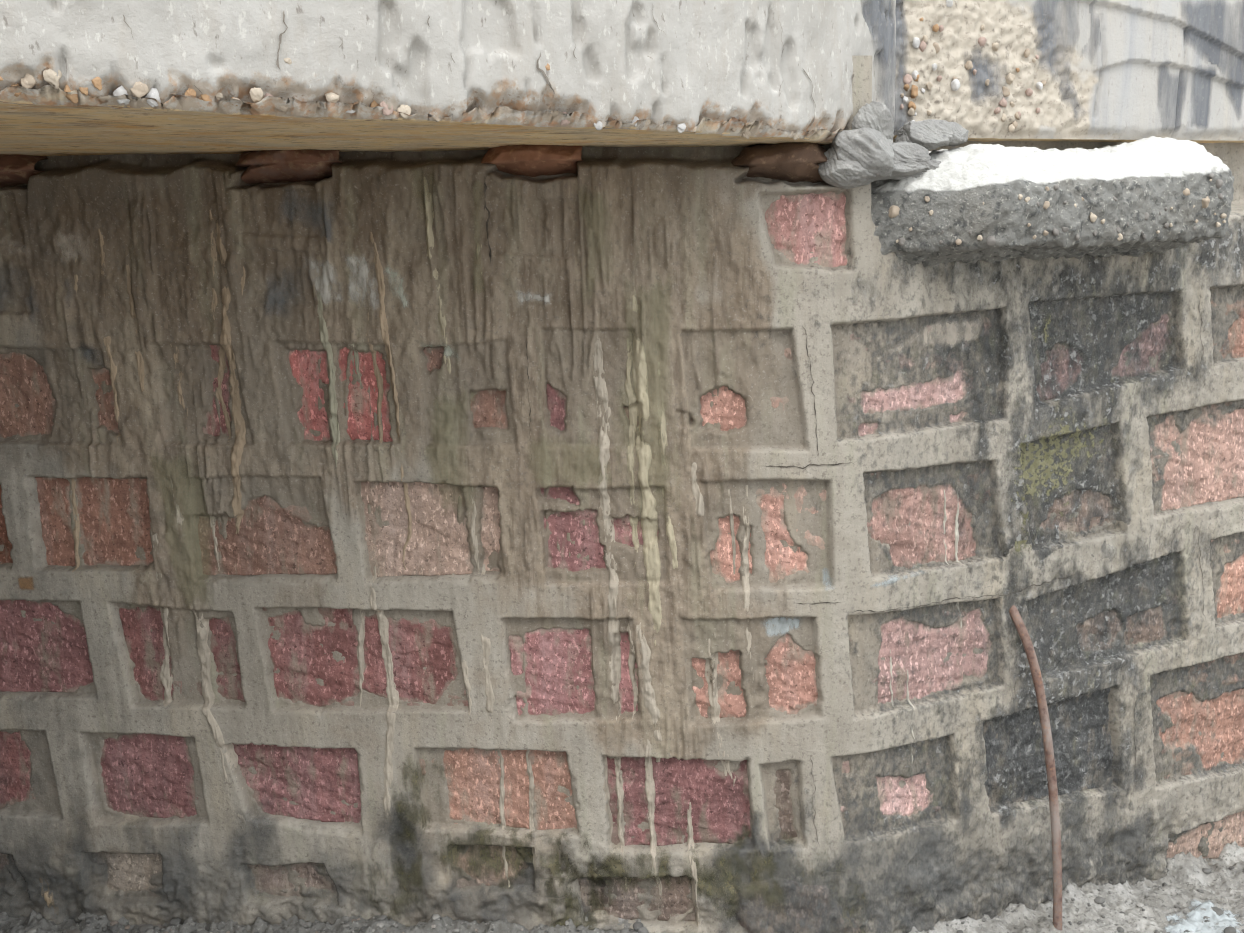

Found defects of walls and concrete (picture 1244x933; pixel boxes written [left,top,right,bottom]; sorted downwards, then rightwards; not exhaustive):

damp [424,162,452,374]
damp [209,210,246,534]
damp [311,232,412,570]
damp [159,607,173,707]
damp [204,500,220,571]
damp [470,487,486,575]
damp [461,634,495,726]
damp [593,287,678,895]
damp [687,223,1244,933]
damp [0,840,106,923]
damp [481,749,536,923]